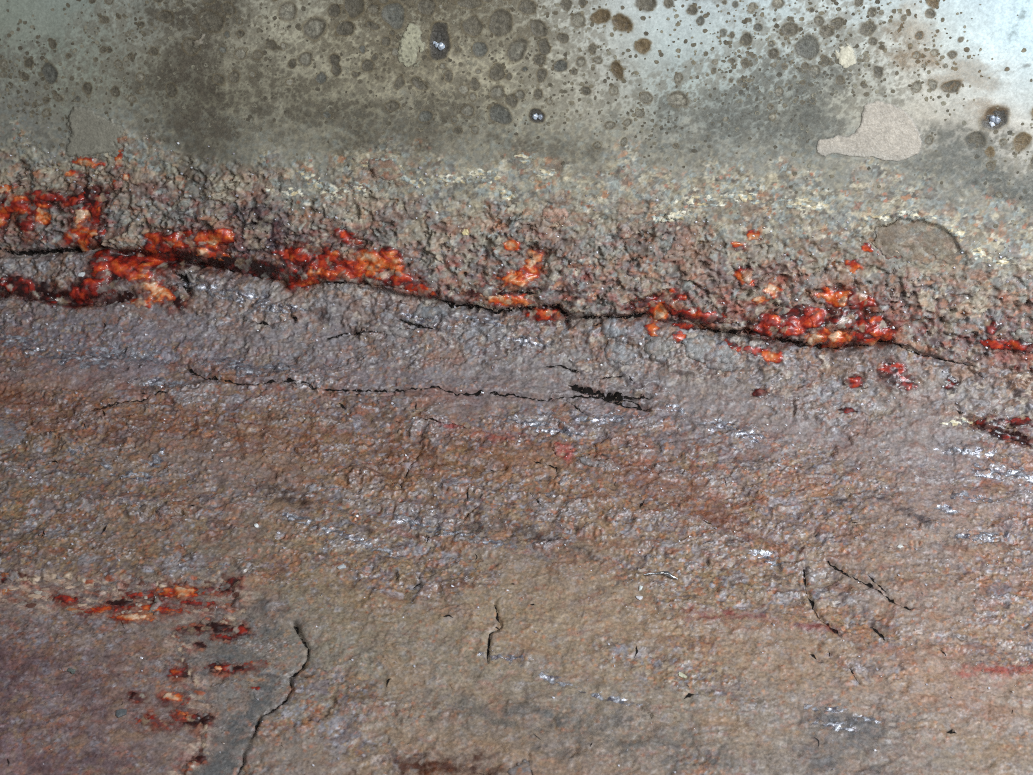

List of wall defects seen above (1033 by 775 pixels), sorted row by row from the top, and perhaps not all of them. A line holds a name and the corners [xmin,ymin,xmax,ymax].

water stain [155,14,234,157]
spalling [711,58,750,87]
spalling [720,0,762,46]
spalling [768,0,884,88]
peeling [817,100,933,161]
rust [0,150,448,323]
rust [460,236,561,321]
rust [601,266,903,372]
crack [91,390,166,411]
crack [185,366,650,415]
rust [50,574,252,651]
crack [255,626,309,732]